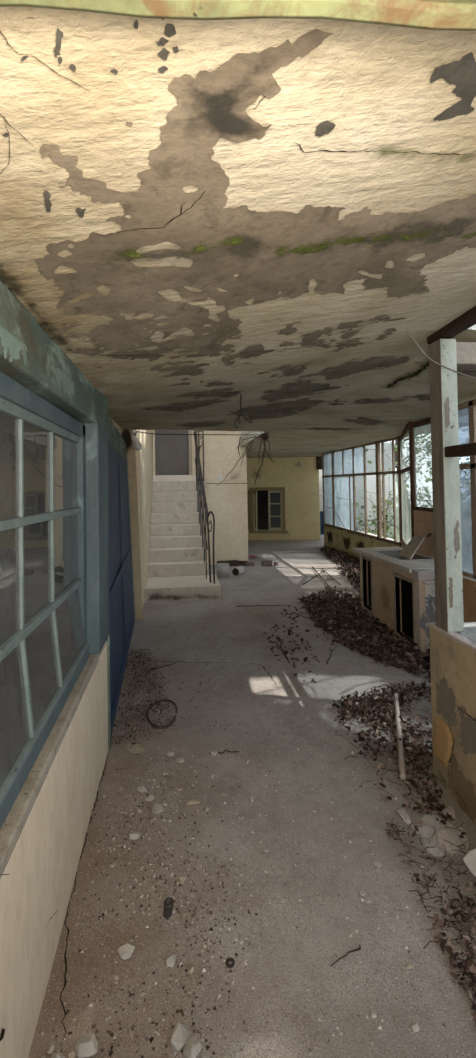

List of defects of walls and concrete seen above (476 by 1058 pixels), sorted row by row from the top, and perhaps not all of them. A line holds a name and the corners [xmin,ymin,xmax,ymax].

crack [0,30,90,91]
water stain [195,85,254,135]
crack [0,114,31,174]
crack [292,142,475,155]
crack [103,191,206,236]
flaking render [35,19,476,431]
water stain [363,219,469,247]
water stain [0,265,36,309]
peeling [0,326,27,366]
flaking render [435,677,476,823]
crack [45,758,108,1040]